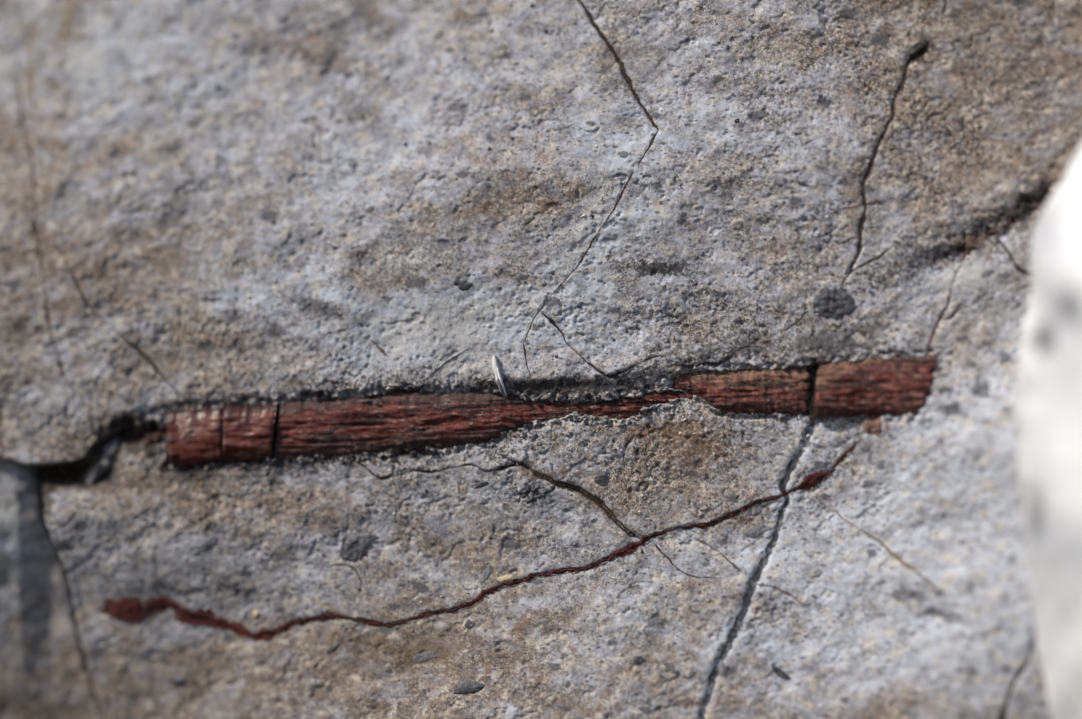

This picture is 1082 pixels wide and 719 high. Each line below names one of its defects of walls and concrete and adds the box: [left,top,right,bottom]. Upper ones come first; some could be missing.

crack [16,51,180,444]
crack [523,0,770,378]
crack [785,307,814,331]
crack [835,47,927,289]
crack [0,403,8,453]
spalling [18,419,168,511]
crack [284,452,803,627]
spalling [594,472,609,486]